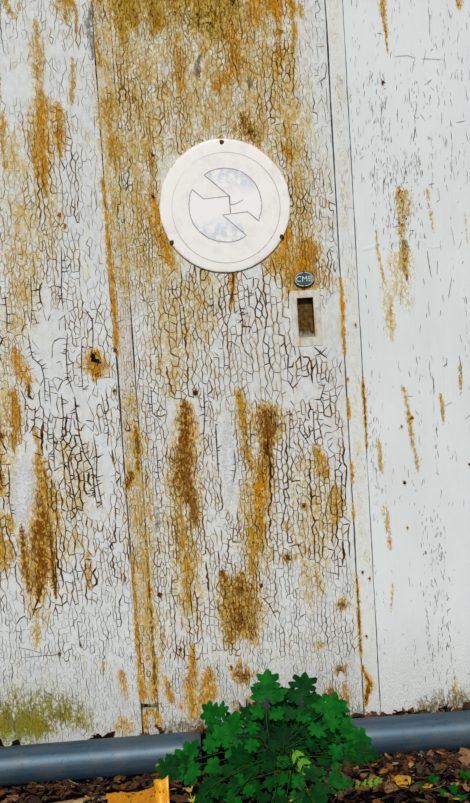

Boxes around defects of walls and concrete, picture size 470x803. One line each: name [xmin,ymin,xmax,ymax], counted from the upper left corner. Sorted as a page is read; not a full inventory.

crack [432,4,470,96]
crack [338,73,468,285]
corrosion [0,18,92,648]
corrosion [82,347,109,382]
corrosion [90,0,357,731]
crack [357,416,395,523]
corrosion [376,187,412,341]
corrosion [401,386,419,471]
crack [398,336,469,475]
corrosion [335,575,374,706]
crack [405,491,457,711]
damp [0,688,97,745]